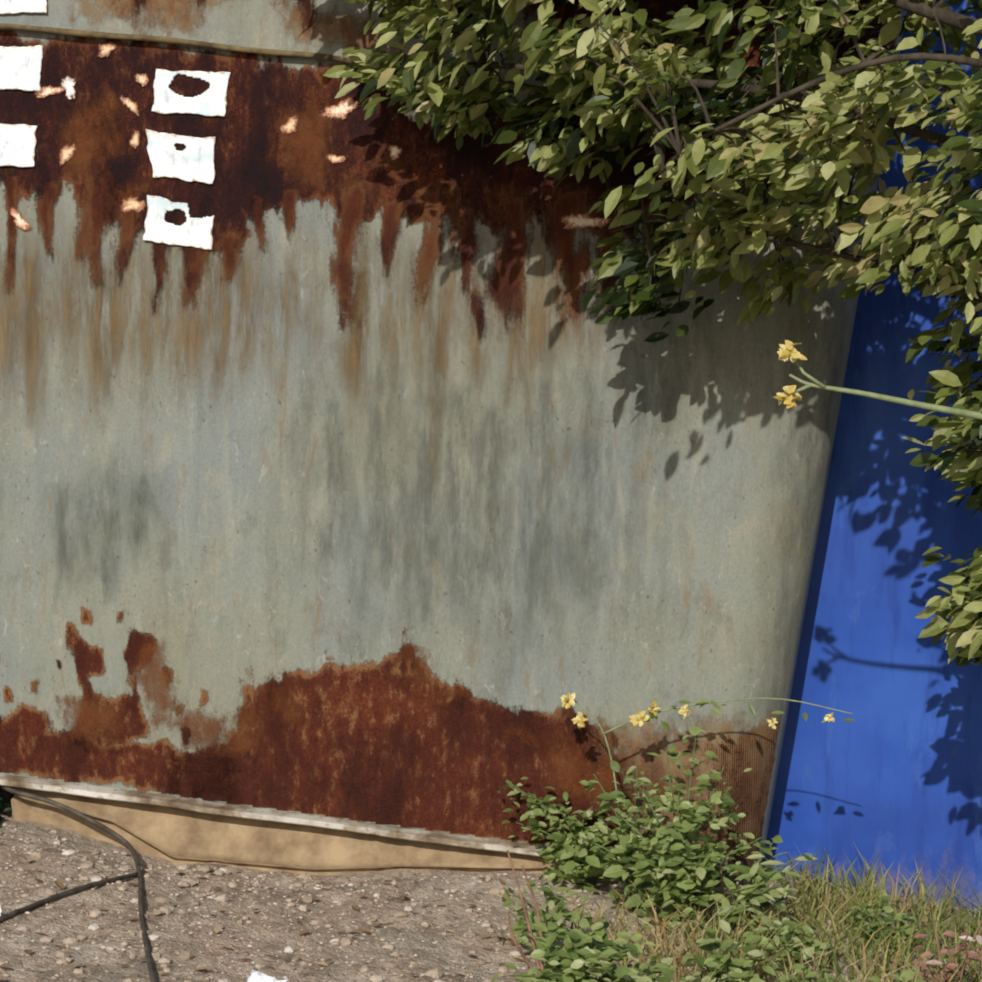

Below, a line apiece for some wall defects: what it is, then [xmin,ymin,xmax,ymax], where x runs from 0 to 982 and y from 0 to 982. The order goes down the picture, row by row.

rust [522,0,802,81]
rust [800,0,900,65]
rust [0,0,713,391]
rust [0,607,779,866]